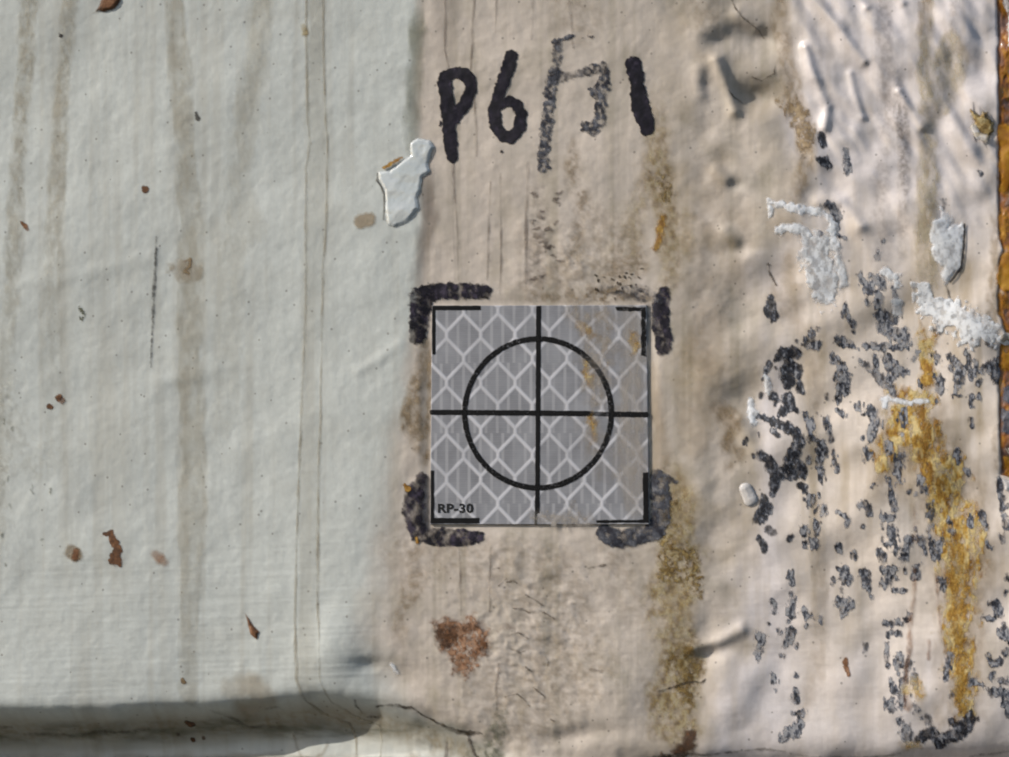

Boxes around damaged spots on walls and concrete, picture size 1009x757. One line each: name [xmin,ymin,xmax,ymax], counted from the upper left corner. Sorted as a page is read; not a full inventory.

peeling [376,138,434,227]
rust [970,0,1009,477]
peeling [742,198,1009,619]
rust [102,530,122,567]
rust [432,616,488,676]
peeling [753,569,822,661]
peeling [778,672,805,743]
rust [870,329,987,723]
peeling [882,611,979,749]
peeling [967,575,1009,719]